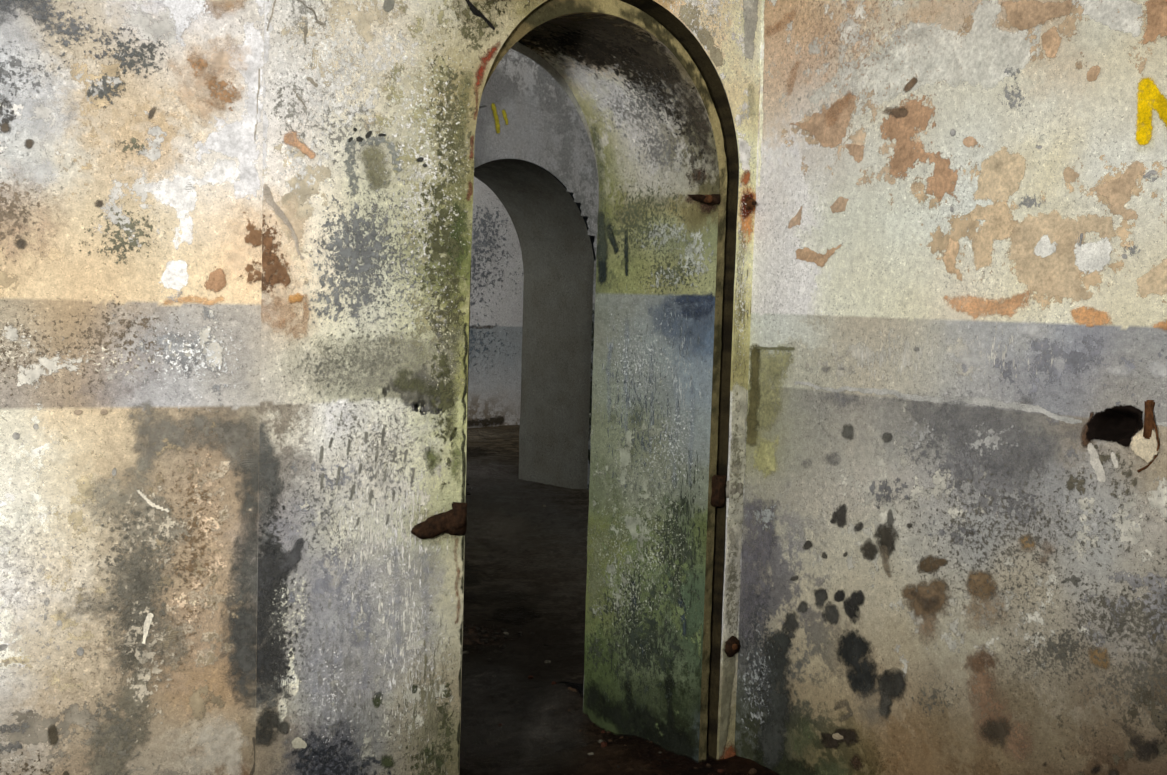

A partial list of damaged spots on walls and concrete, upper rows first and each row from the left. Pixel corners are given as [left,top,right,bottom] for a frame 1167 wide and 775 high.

crack [466,0,495,30]
corrosion [741,171,756,242]
peeling [672,0,1167,310]
damp [0,0,726,775]
spalling [795,297,1167,513]